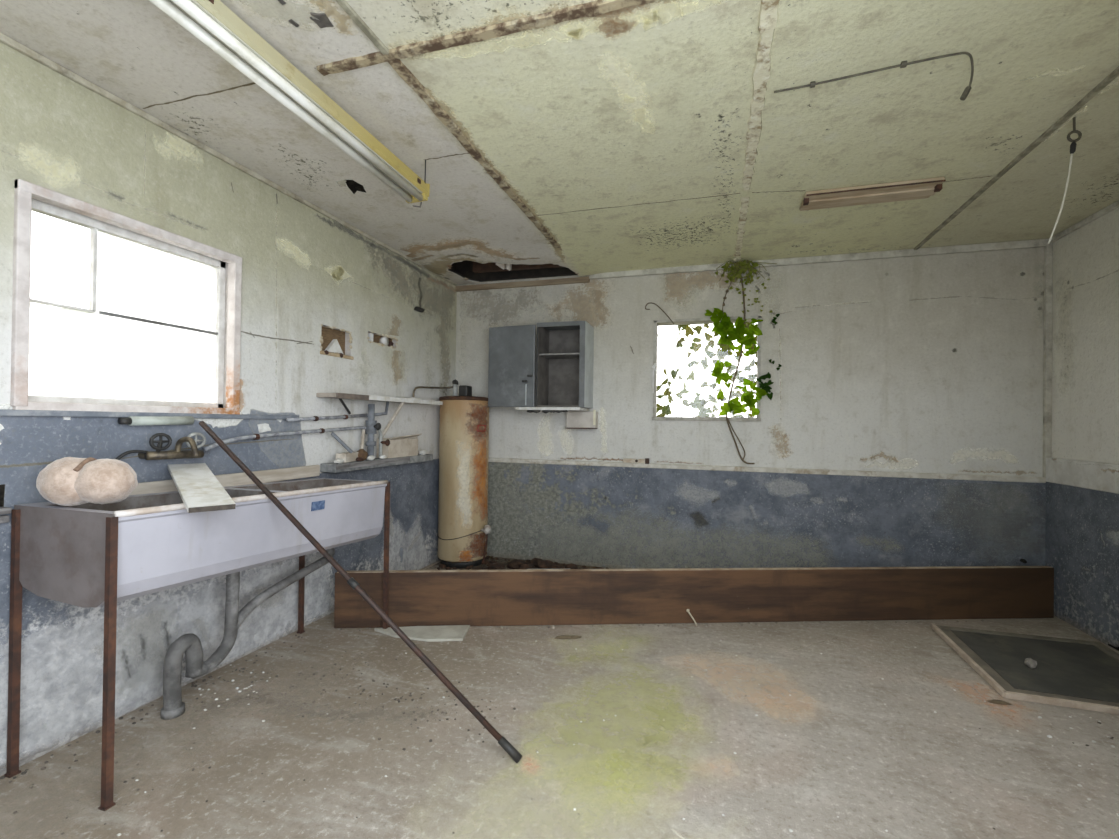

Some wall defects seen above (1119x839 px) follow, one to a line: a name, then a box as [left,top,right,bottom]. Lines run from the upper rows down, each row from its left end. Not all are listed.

peeling [241,0,334,28]
leakage [317,214,537,393]